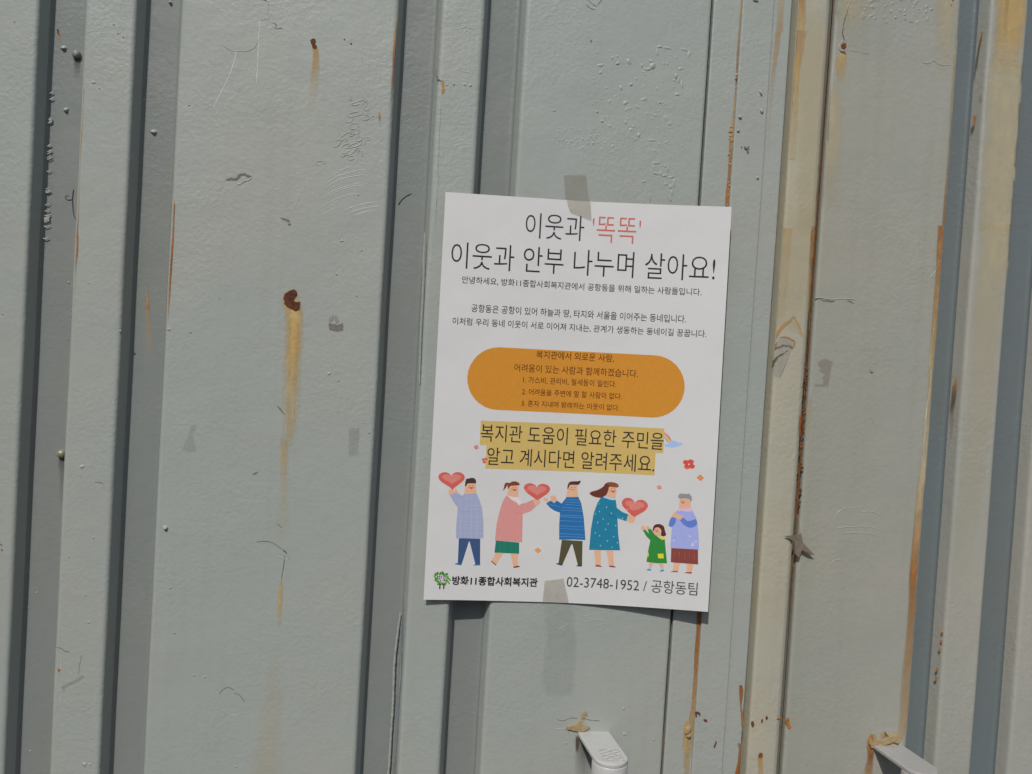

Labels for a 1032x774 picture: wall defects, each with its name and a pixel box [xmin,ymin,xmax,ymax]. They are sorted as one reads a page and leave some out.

corrosion [726,0,742,207]
corrosion [981,0,1024,261]
corrosion [283,289,301,410]
corrosion [776,0,849,535]
corrosion [930,149,950,378]
corrosion [687,611,707,761]
corrosion [739,548,795,762]
corrosion [906,426,928,665]